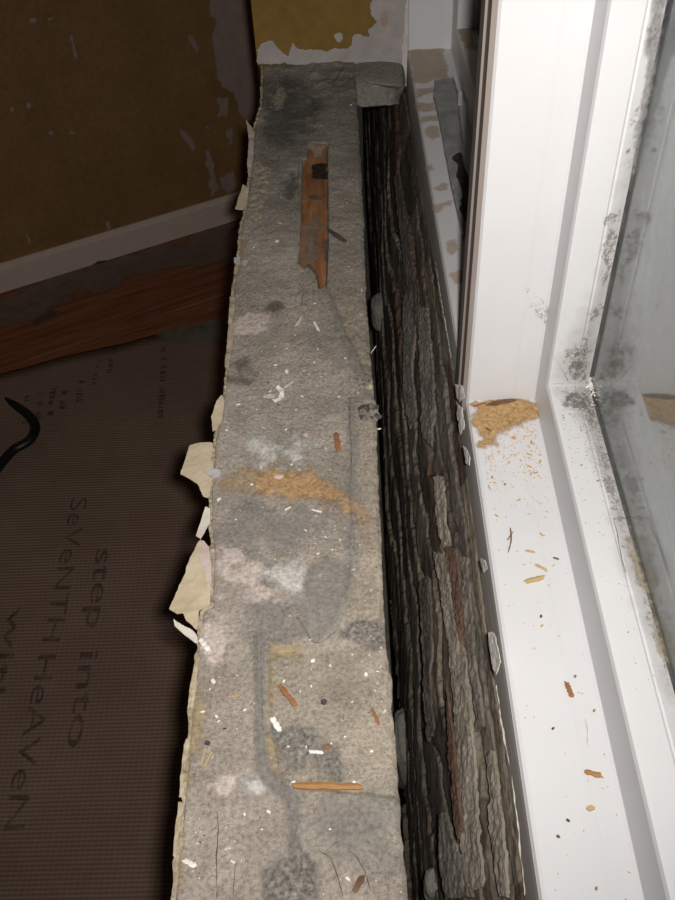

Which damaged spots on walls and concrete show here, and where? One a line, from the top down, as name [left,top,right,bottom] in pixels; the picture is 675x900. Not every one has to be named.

peeling [209,0,407,224]
damp [624,0,666,172]
damp [601,210,621,286]
peeling [169,442,221,644]
peeling [211,395,225,431]
damp [561,331,668,670]